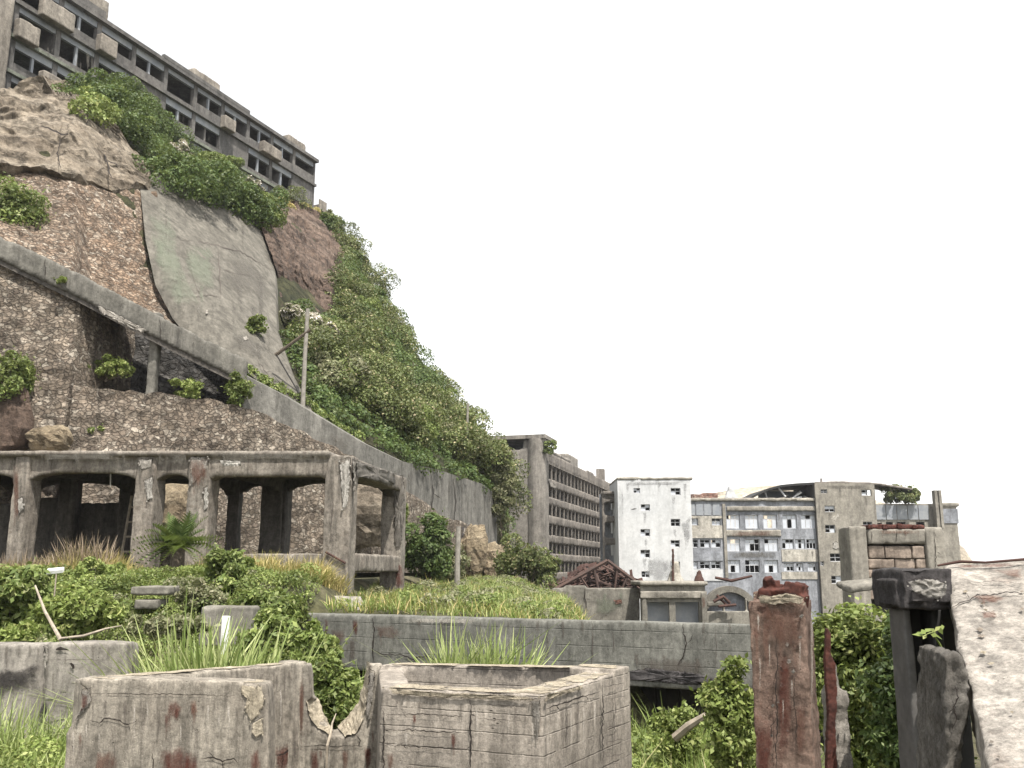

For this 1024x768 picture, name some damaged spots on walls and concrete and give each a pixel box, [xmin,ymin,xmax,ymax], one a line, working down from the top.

spalling [339,457,396,510]
crack [677,626,717,667]
spalling [75,663,283,721]
spalling [241,679,266,737]
spalling [306,661,375,737]
rust [757,668,789,768]